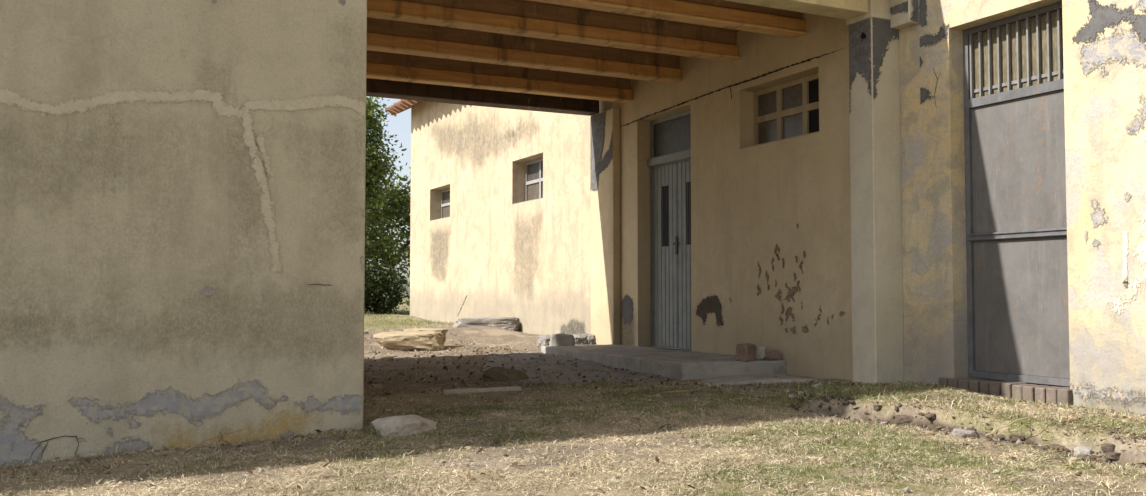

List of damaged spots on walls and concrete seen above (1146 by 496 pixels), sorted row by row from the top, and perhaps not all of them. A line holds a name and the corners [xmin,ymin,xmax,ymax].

flaking render [849,0,949,113]
peeling [1072,0,1146,78]
peeling [1125,95,1146,135]
peeling [1085,199,1108,248]
peeling [695,293,732,328]
peeling [757,244,845,334]
peeling [0,395,48,467]
peeling [68,379,362,438]
peeling [1069,382,1146,408]